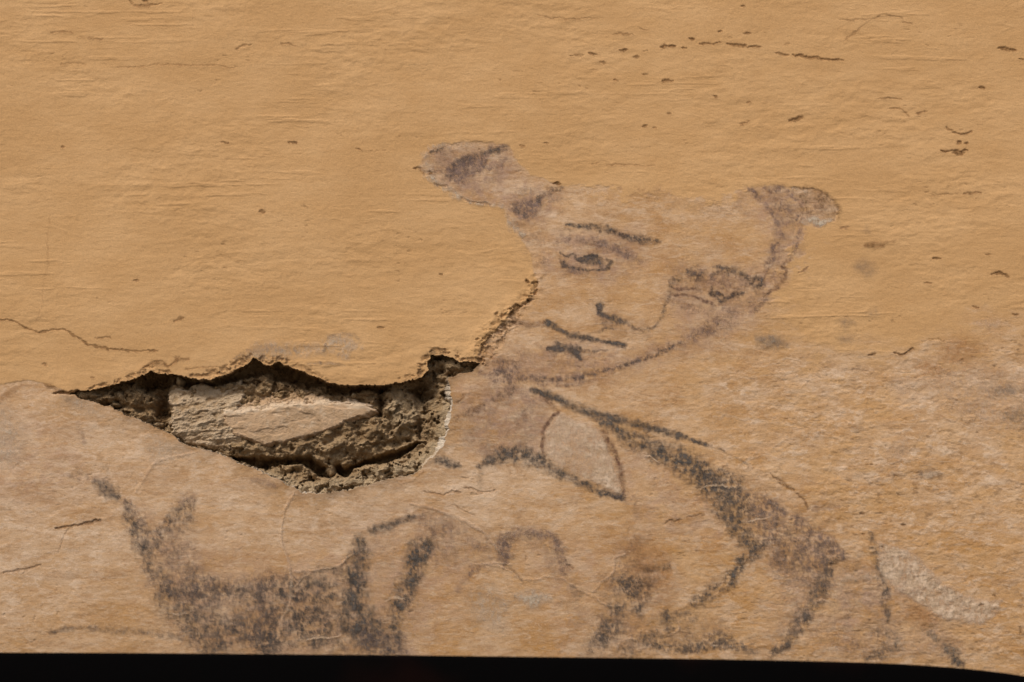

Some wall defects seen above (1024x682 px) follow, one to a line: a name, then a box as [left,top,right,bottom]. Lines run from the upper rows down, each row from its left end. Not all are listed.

peeling [0,141,1024,676]